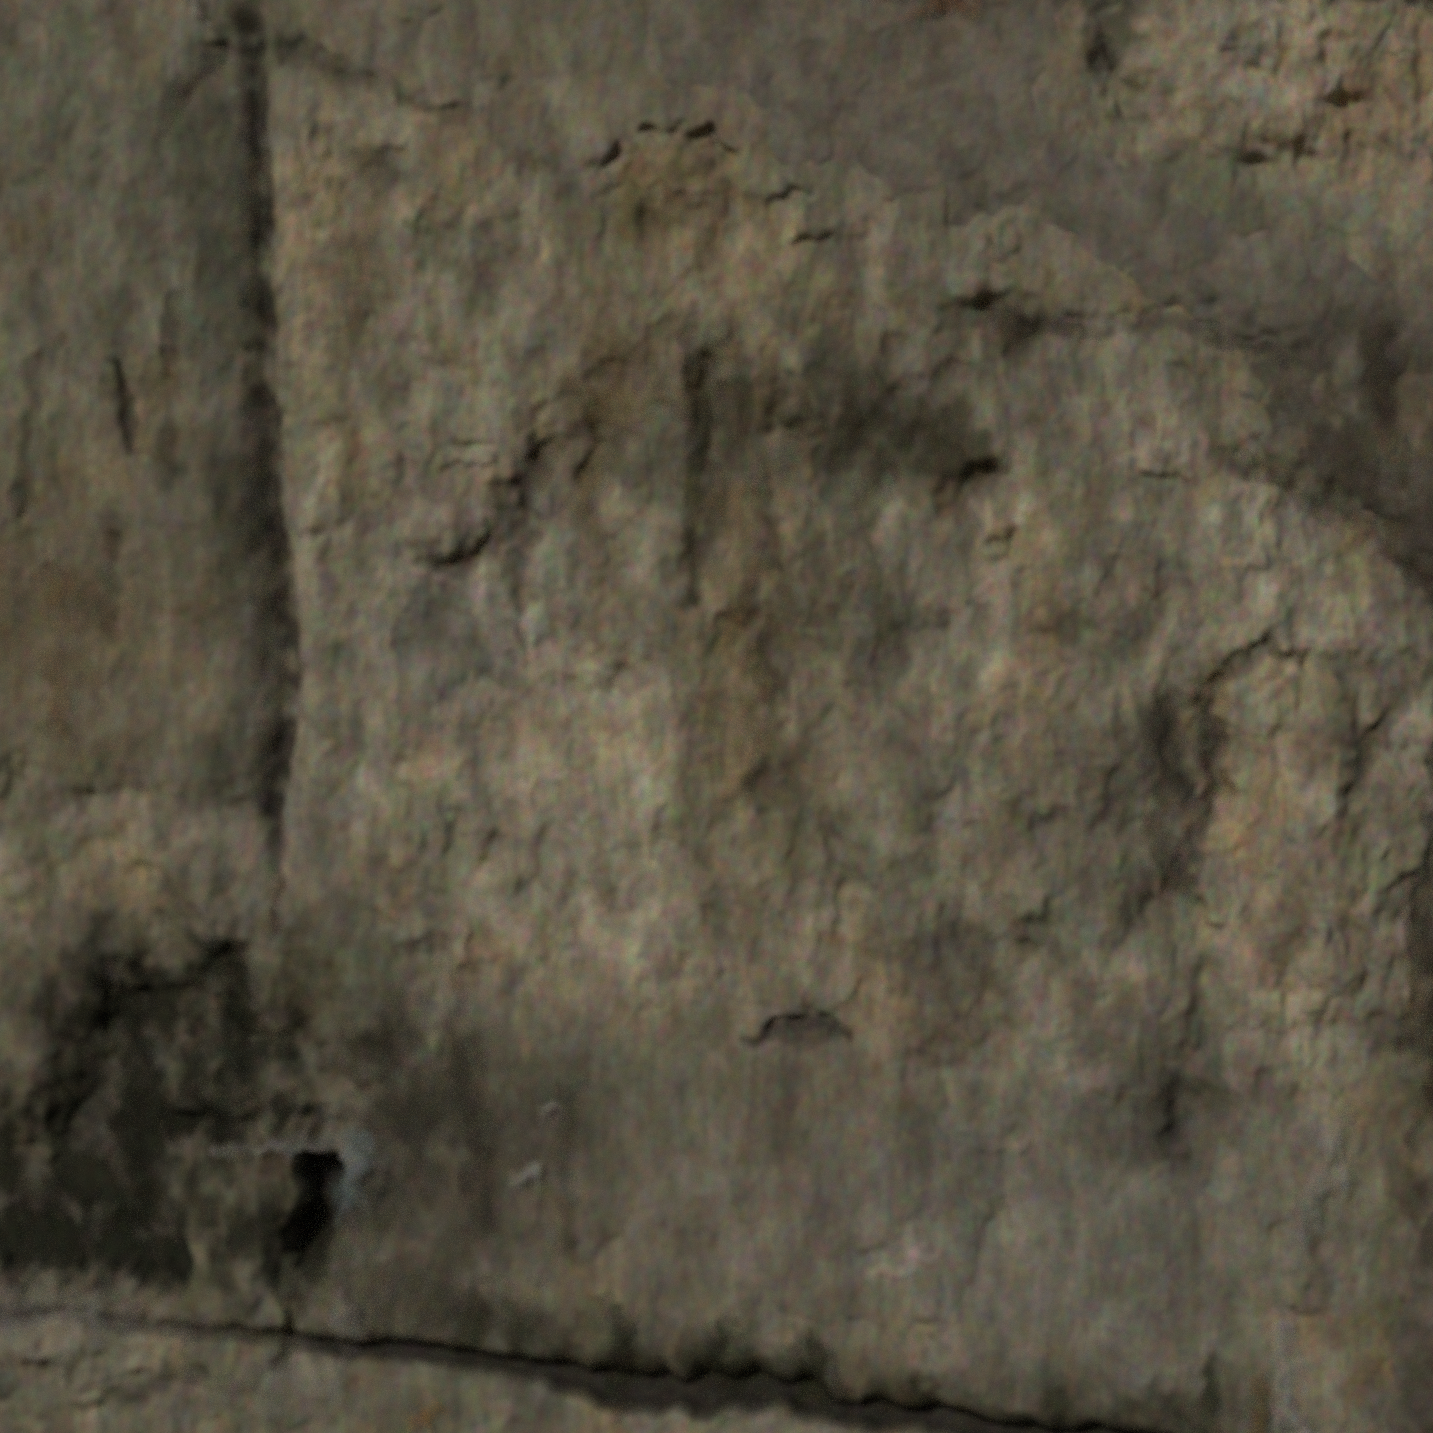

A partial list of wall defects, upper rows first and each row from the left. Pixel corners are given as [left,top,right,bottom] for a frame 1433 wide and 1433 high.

crack [249,44,267,157]
crack [254,197,272,242]
crack [257,283,276,330]
crack [253,383,300,834]
crack [297,1335,1145,1433]